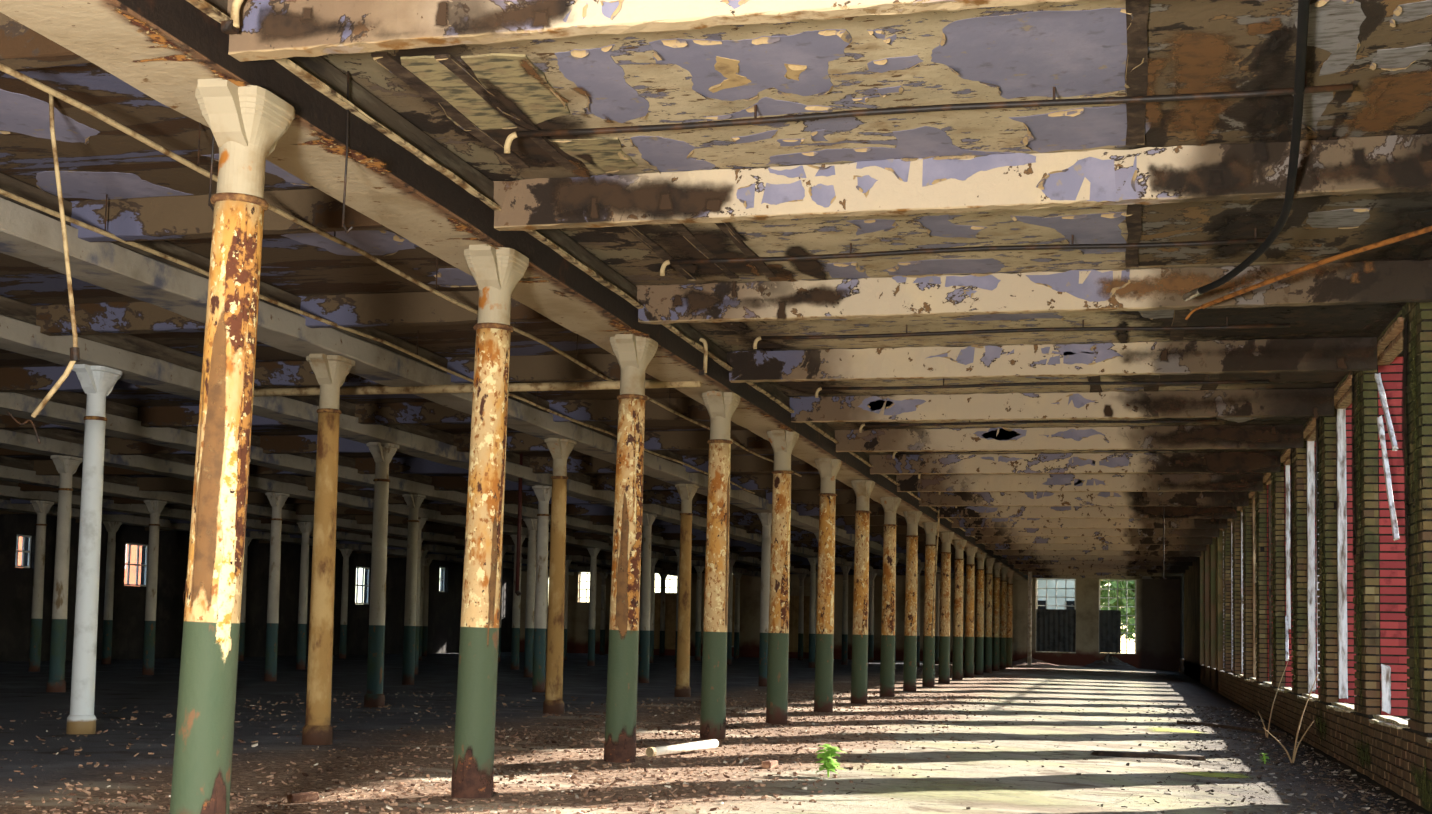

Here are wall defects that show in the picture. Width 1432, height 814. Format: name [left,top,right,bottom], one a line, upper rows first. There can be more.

damp [259,8,354,40]
damp [436,0,570,31]
peeling [373,44,715,175]
damp [463,66,848,351]
peeling [649,8,1150,302]
peeling [827,258,1065,322]
damp [1149,28,1293,196]
peeling [1292,0,1432,132]
corrosion [183,208,258,606]
corrosion [487,351,509,646]
corrosion [615,412,643,639]
corrosion [780,551,789,633]